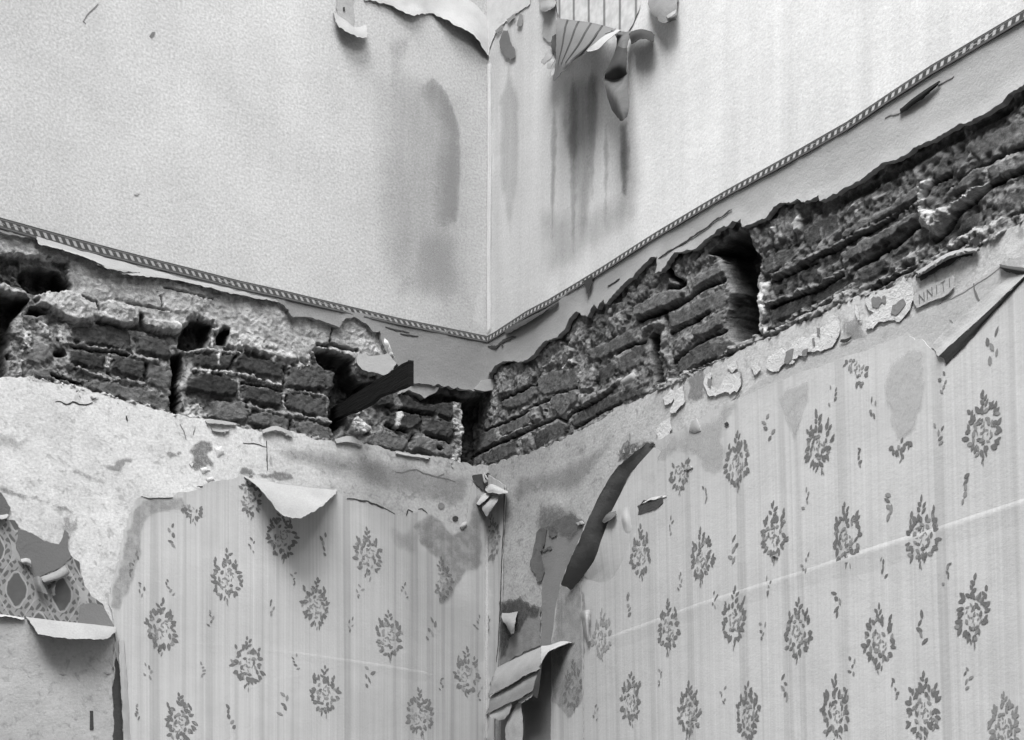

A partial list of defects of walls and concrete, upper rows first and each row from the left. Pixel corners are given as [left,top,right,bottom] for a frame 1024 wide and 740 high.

peeling [499,30,516,60]
flaking render [0,91,1024,482]
peeling [16,529,71,577]